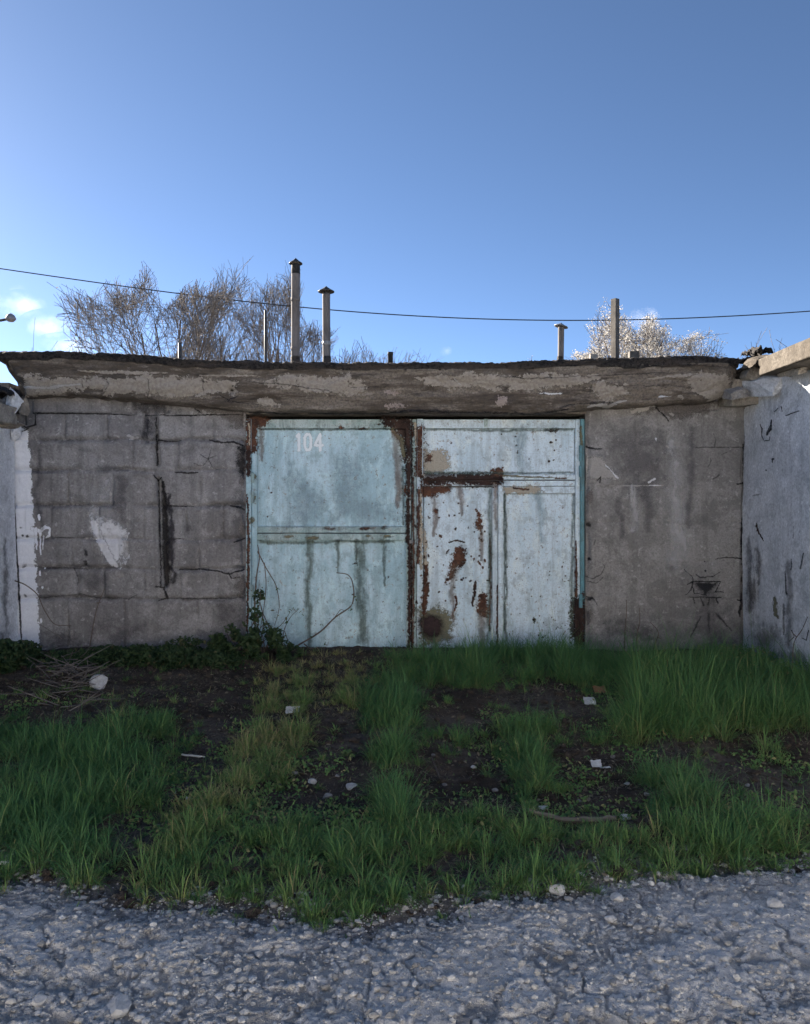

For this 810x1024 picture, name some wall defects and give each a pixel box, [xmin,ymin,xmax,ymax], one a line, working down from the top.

flaking render [23,370,367,408]
flaking render [384,390,408,410]
flaking render [414,367,735,421]
crack [15,372,680,644]
corrosion [246,416,567,648]
leakage [260,538,394,647]
corrosion [567,540,585,649]